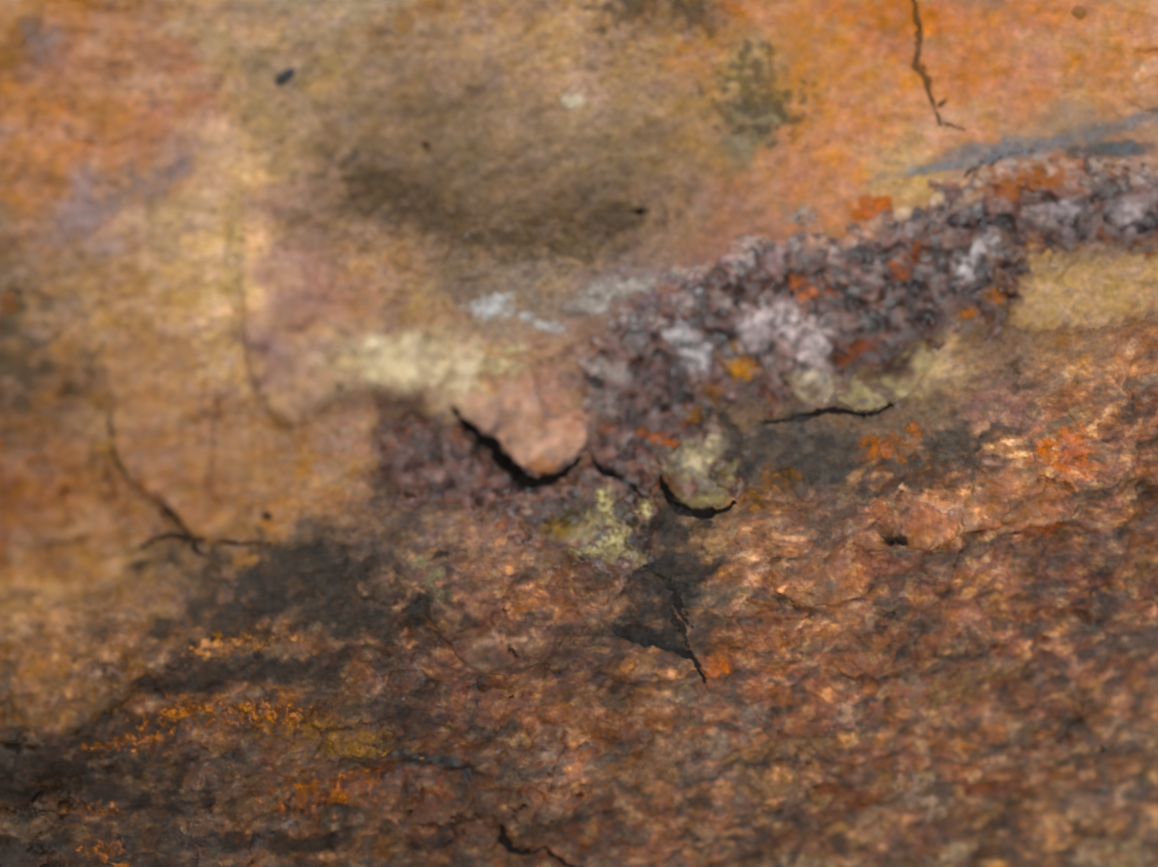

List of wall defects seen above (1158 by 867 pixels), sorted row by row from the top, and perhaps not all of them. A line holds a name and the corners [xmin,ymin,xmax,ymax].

crack [912,0,966,131]
corrosion [853,194,892,219]
crack [965,149,1035,177]
corrosion [994,166,1066,200]
corrosion [732,355,754,379]
corrosion [861,419,922,468]
corrosion [1036,424,1094,476]
crack [107,411,271,557]
peeling [770,430,1081,608]
corrosion [181,632,306,661]
corrosion [81,694,395,813]
corrosion [76,841,129,867]